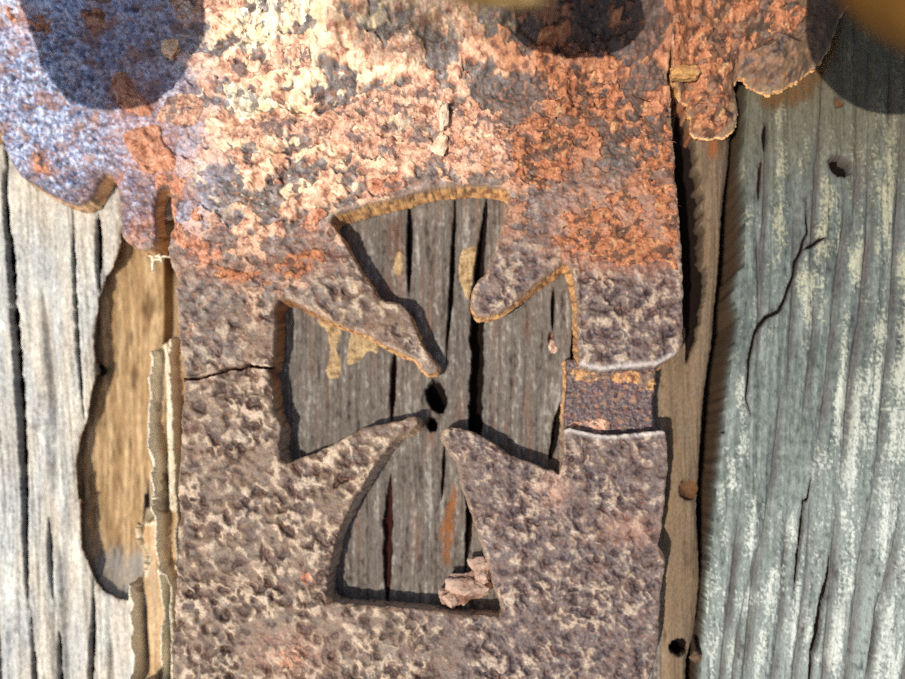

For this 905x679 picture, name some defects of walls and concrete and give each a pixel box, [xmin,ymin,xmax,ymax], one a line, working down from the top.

rust [5,6,58,38]
rust [80,0,111,36]
rust [169,0,245,33]
rust [226,0,809,270]
rust [31,152,50,173]
rust [112,71,327,287]
crack [745,206,825,415]
crack [183,364,276,382]
rust [570,369,656,391]
rust [568,418,611,434]
rust [300,572,313,586]